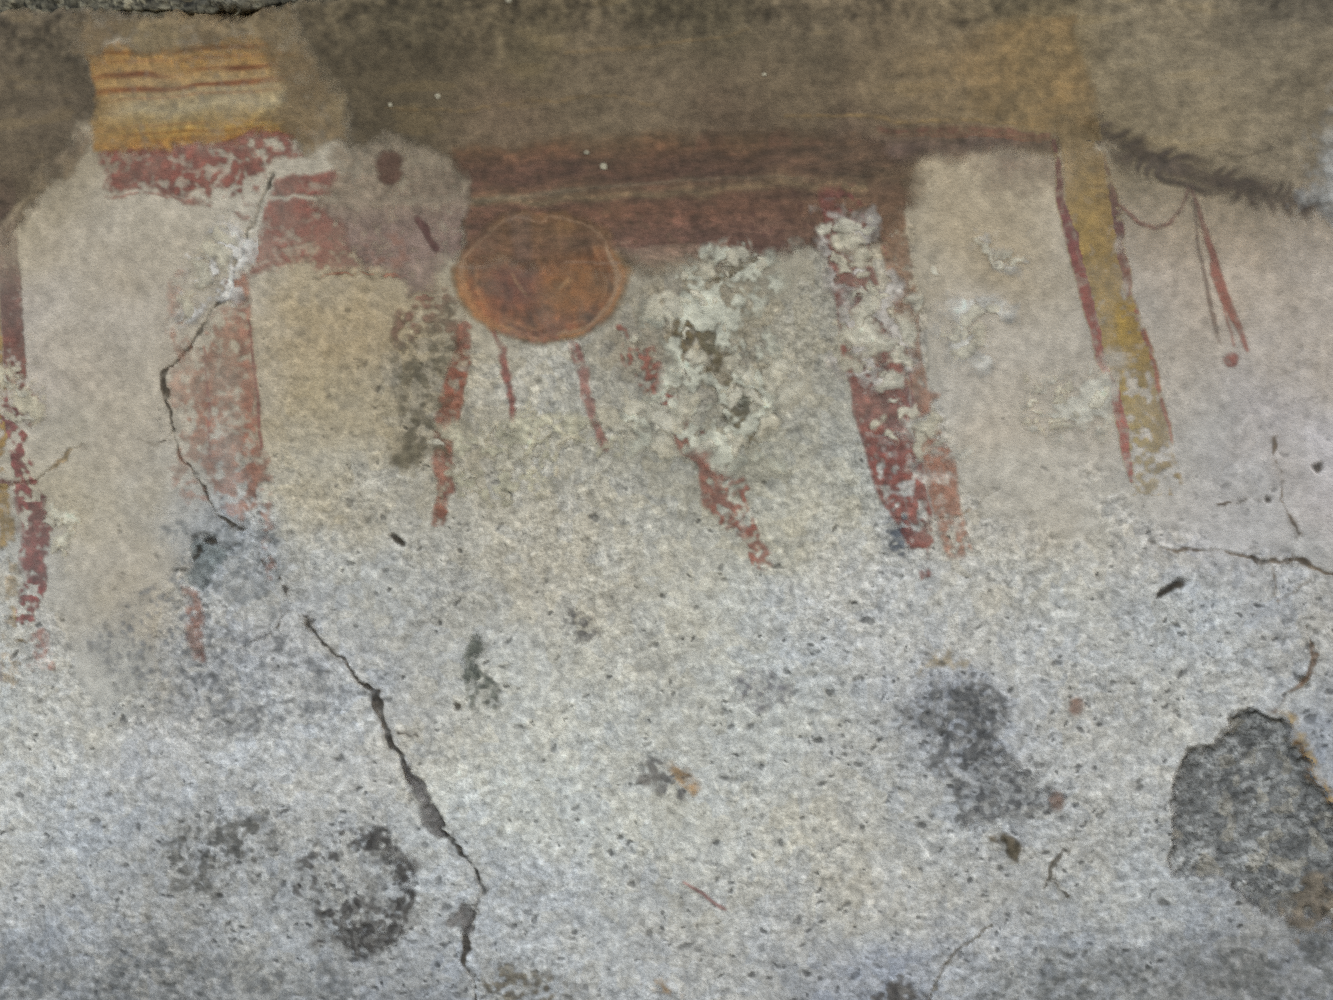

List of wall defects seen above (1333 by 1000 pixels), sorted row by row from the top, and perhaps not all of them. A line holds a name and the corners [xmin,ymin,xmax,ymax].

crack [161,300,243,530]
crack [248,561,480,1000]
damp [350,828,412,894]
spalling [1168,710,1333,931]